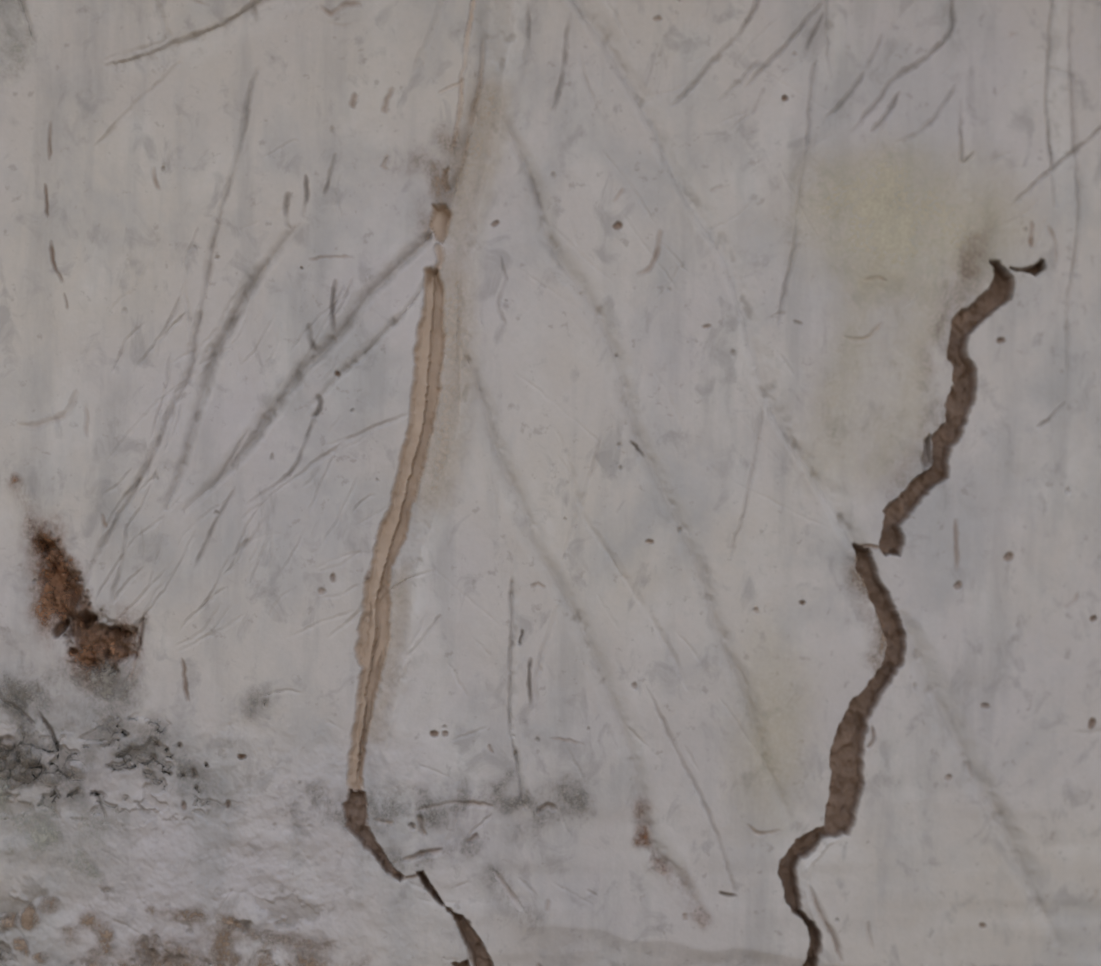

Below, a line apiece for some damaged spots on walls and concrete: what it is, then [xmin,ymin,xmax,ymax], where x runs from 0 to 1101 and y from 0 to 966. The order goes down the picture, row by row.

spalling [30,525,146,674]
crack [341,0,493,966]
crack [492,870,524,912]
crack [777,221,1045,966]